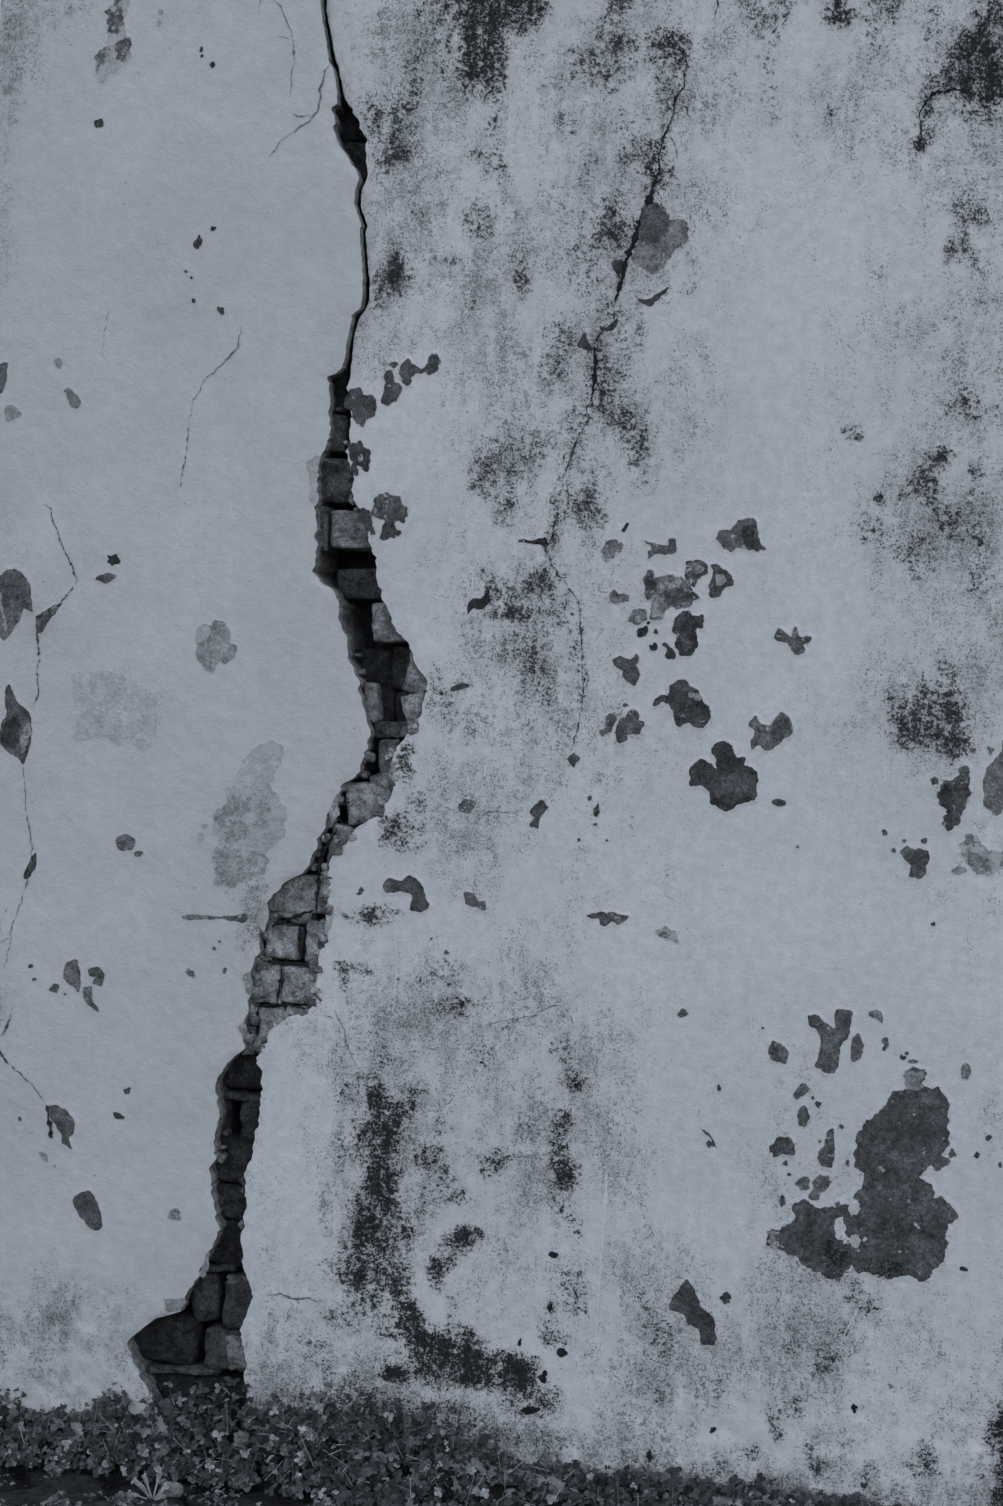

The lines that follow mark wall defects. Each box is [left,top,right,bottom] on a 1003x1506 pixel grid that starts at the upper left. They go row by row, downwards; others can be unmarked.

crack [258,0,368,182]
leakage [360,0,551,244]
leakage [911,0,1003,153]
spalling [267,0,444,909]
leakage [463,0,709,719]
crack [540,54,690,748]
crack [31,504,76,710]
crack [134,372,428,1428]
peeling [598,514,797,816]
peeling [882,735,1003,883]
leakage [282,1001,589,1455]
flaking render [761,1005,974,1287]